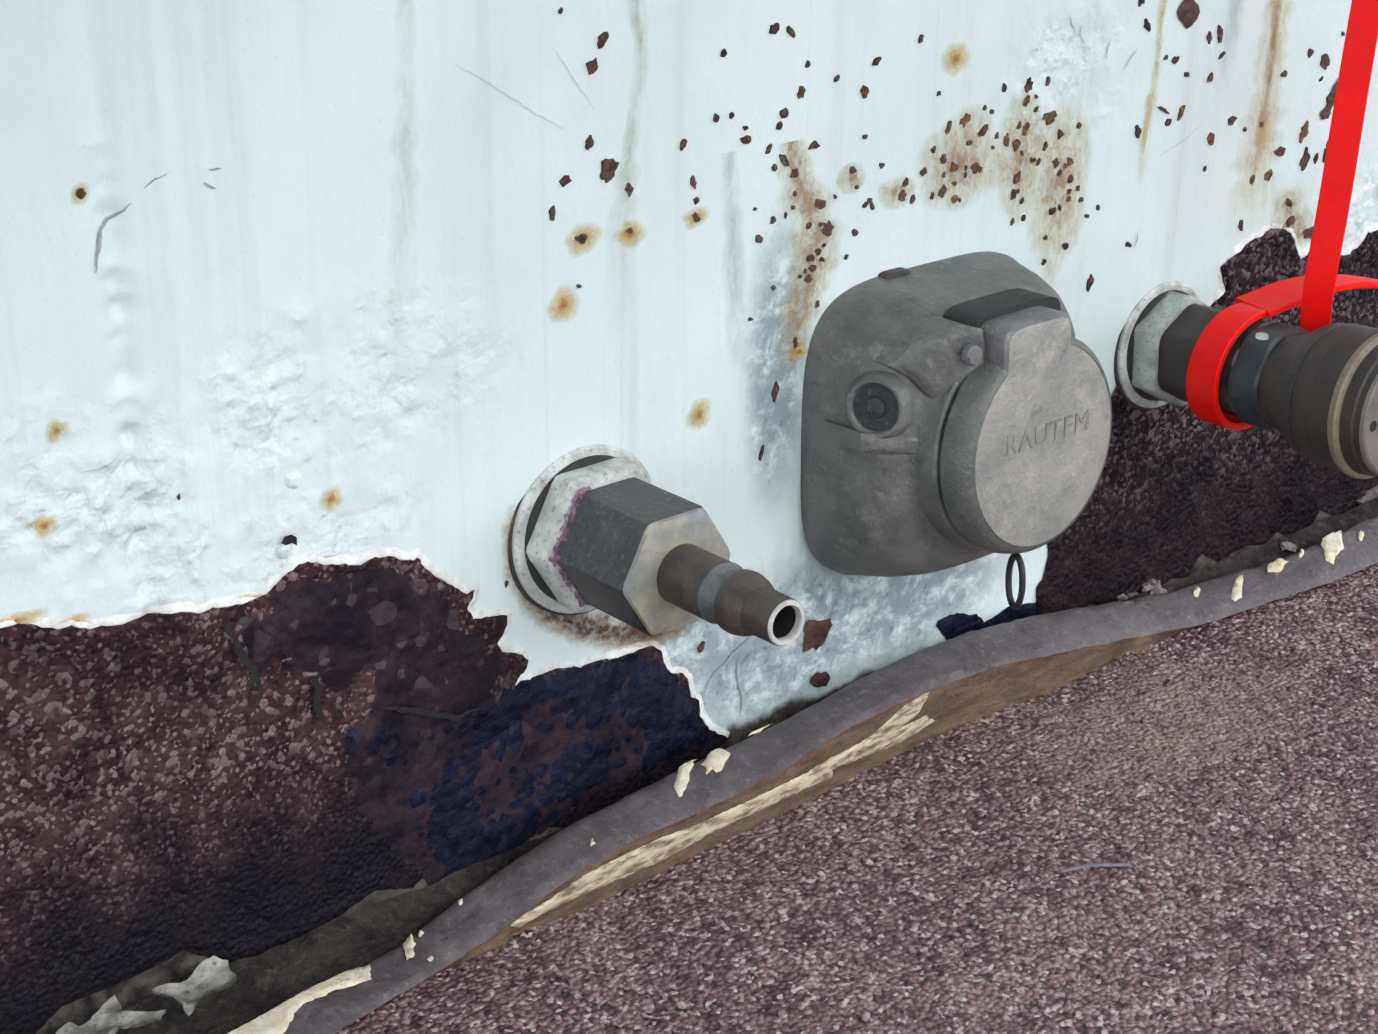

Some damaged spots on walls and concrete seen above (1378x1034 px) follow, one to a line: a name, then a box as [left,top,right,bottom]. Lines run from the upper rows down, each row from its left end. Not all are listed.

peeling [713,86,806,243]
peeling [898,76,1100,226]
corrosion [1254,0,1281,174]
corrosion [554,294,573,315]
corrosion [788,141,829,357]
peeling [1205,198,1313,310]
peeling [1331,222,1378,328]
corrosion [692,405,706,424]
corrosion [36,520,53,533]
peeling [936,385,1378,640]
corrosion [509,566,685,646]
peeling [0,547,732,1034]